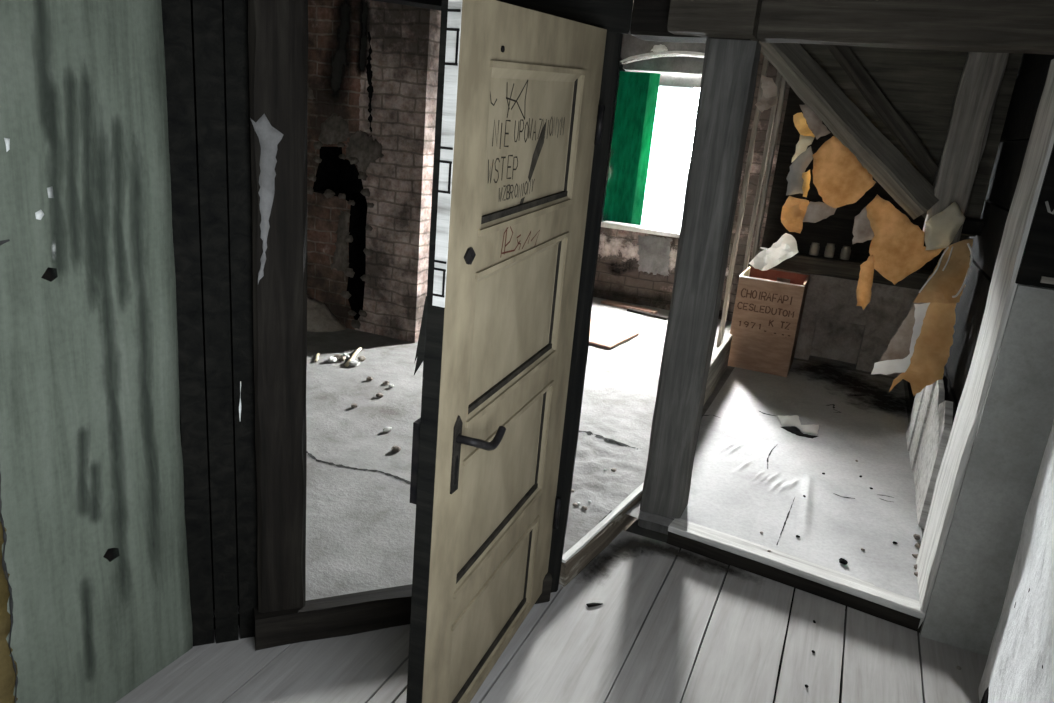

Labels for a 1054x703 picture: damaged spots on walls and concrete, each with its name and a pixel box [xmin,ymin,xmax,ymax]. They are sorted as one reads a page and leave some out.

peeling [250,114,283,283]
peeling [307,113,374,208]
spalling [0,472,18,703]